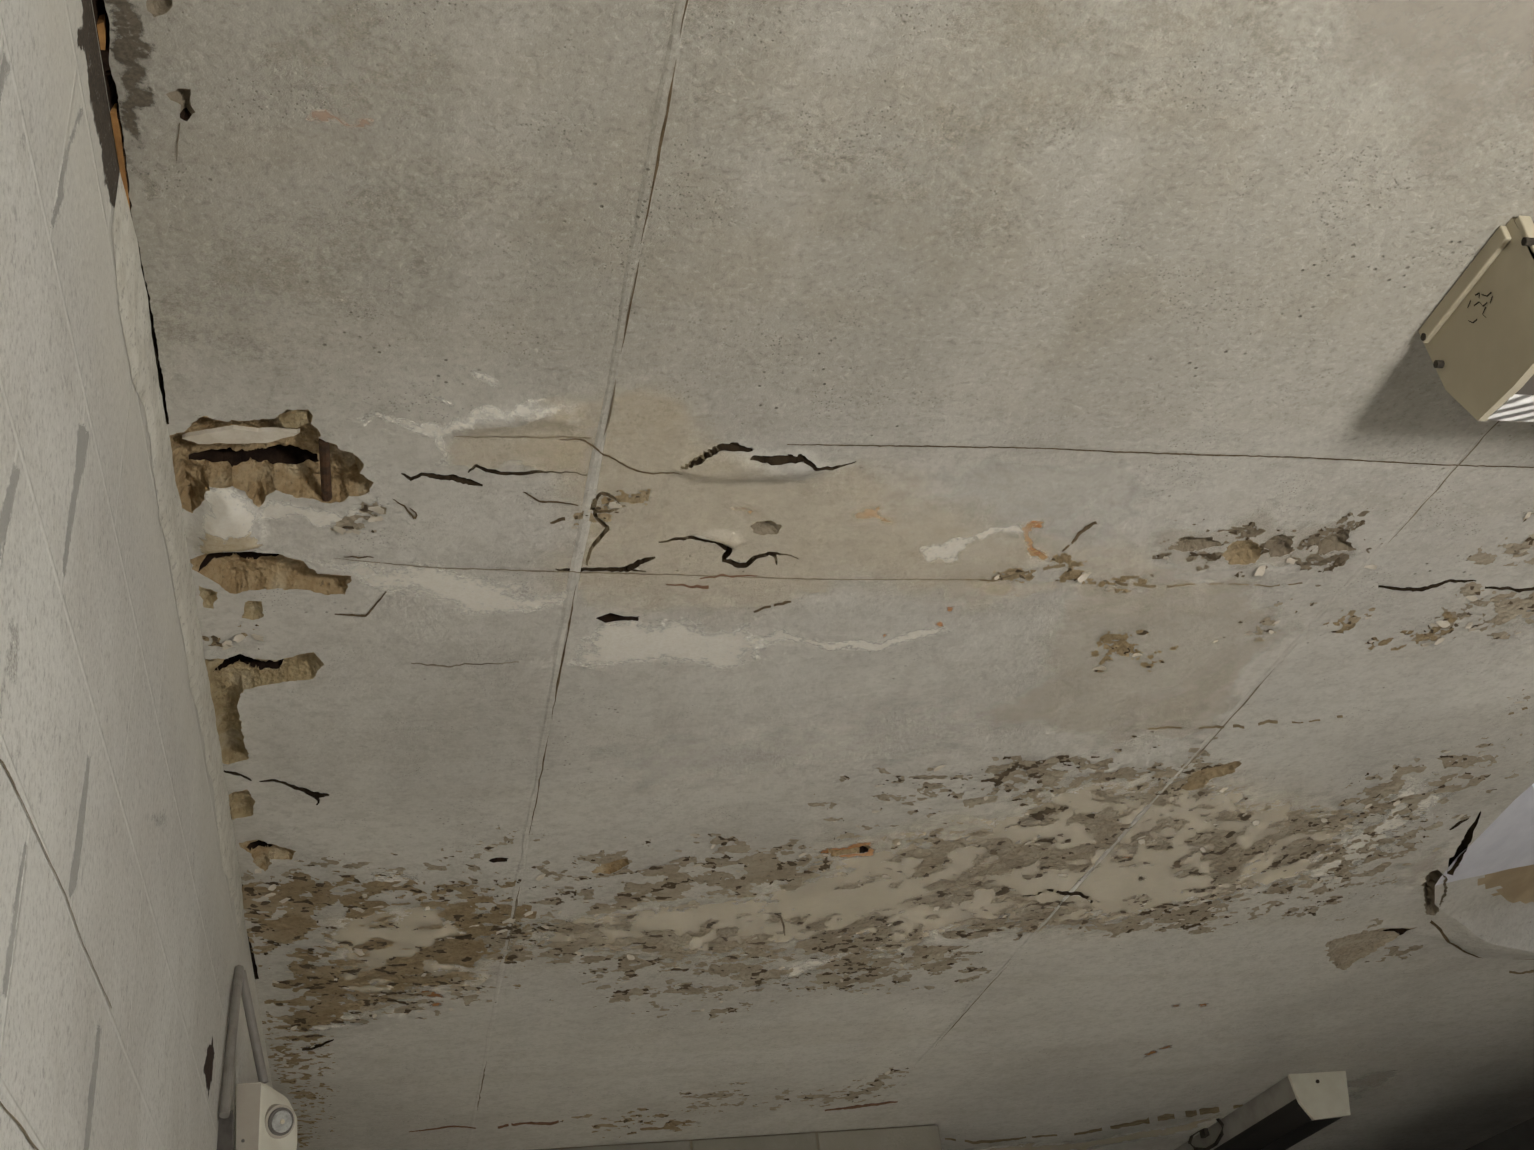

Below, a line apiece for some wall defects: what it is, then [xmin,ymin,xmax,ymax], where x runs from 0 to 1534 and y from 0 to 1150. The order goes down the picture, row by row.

spalling [190,552,352,765]
spalling [170,409,386,535]
crack [335,436,1534,617]
peeling [1091,630,1178,673]
spalling [988,508,1387,642]
peeling [1366,582,1534,651]
peeling [1467,508,1534,566]
spalling [228,789,255,820]
crack [224,770,329,819]
peeling [239,731,1534,1148]